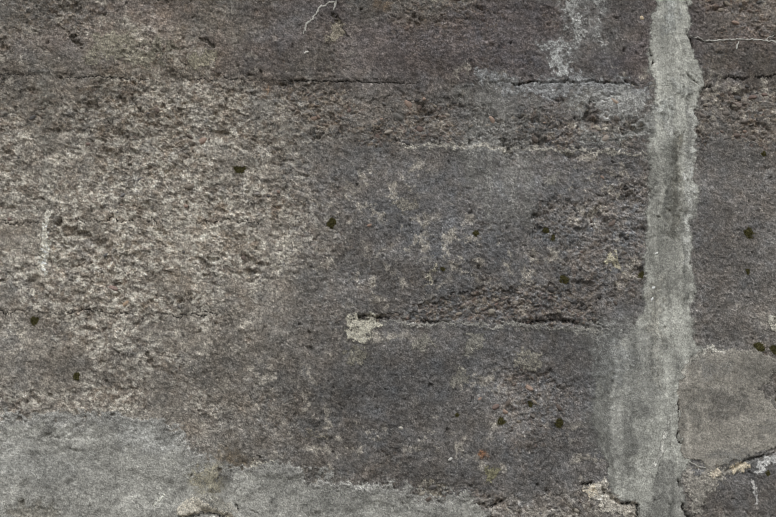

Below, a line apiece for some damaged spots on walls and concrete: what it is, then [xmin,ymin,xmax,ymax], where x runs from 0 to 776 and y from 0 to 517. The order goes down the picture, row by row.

crack [303,0,337,34]
crack [687,34,776,49]
crack [0,73,157,82]
crack [178,76,424,85]
crack [687,74,776,91]
leakage [400,0,659,225]
leakage [664,107,697,266]
crack [518,318,589,328]
leakage [681,343,727,376]
crack [688,452,774,471]
peeling [177,492,238,517]